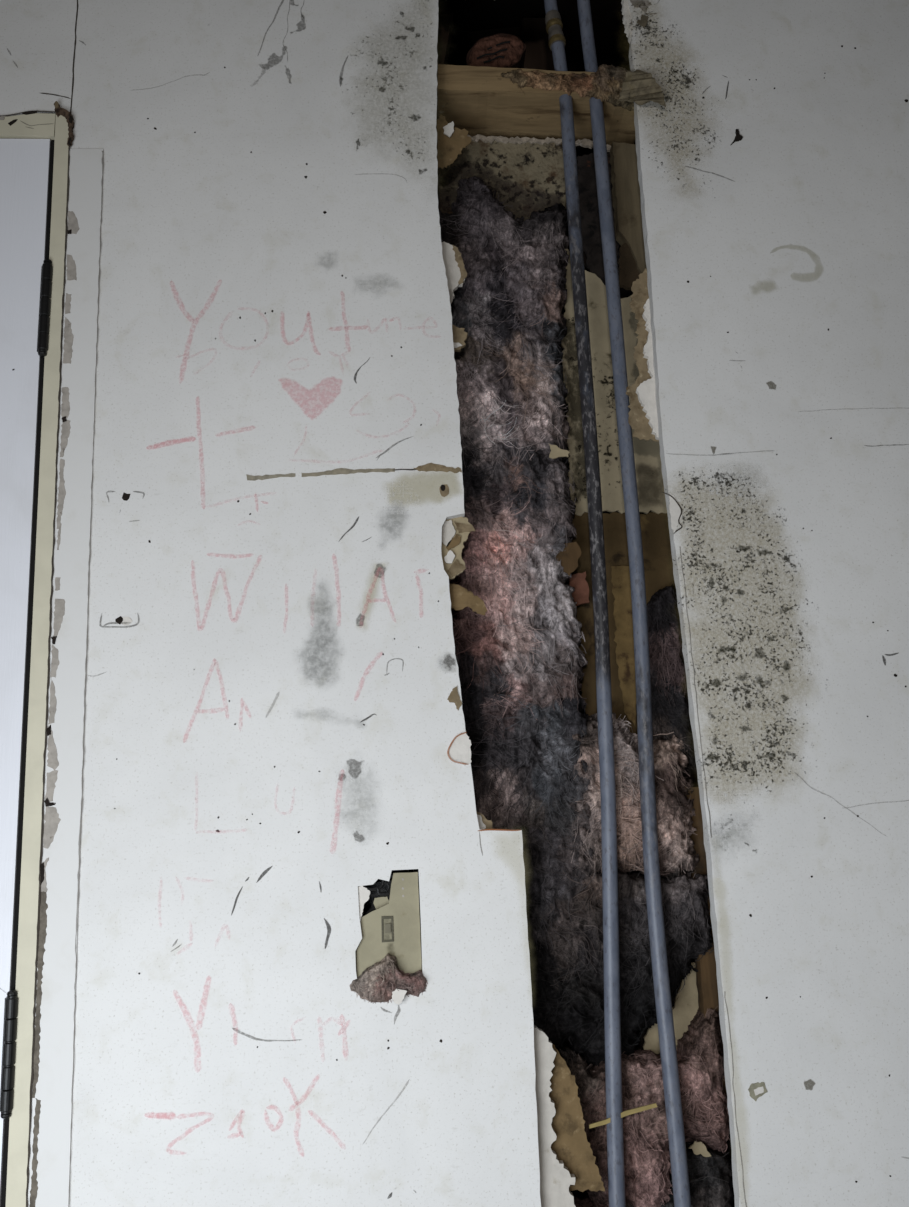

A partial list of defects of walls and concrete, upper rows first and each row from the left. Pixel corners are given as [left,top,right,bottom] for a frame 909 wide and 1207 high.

spalling [438,0,648,72]
leakage [625,0,718,187]
leakage [462,144,566,208]
spalling [576,145,610,158]
spalling [636,299,659,440]
peeling [669,492,682,531]
peeling [442,520,475,577]
leakage [672,472,813,788]
peeling [447,686,462,710]
peeling [447,732,472,765]
spalling [683,771,699,787]
spalling [534,1026,586,1207]